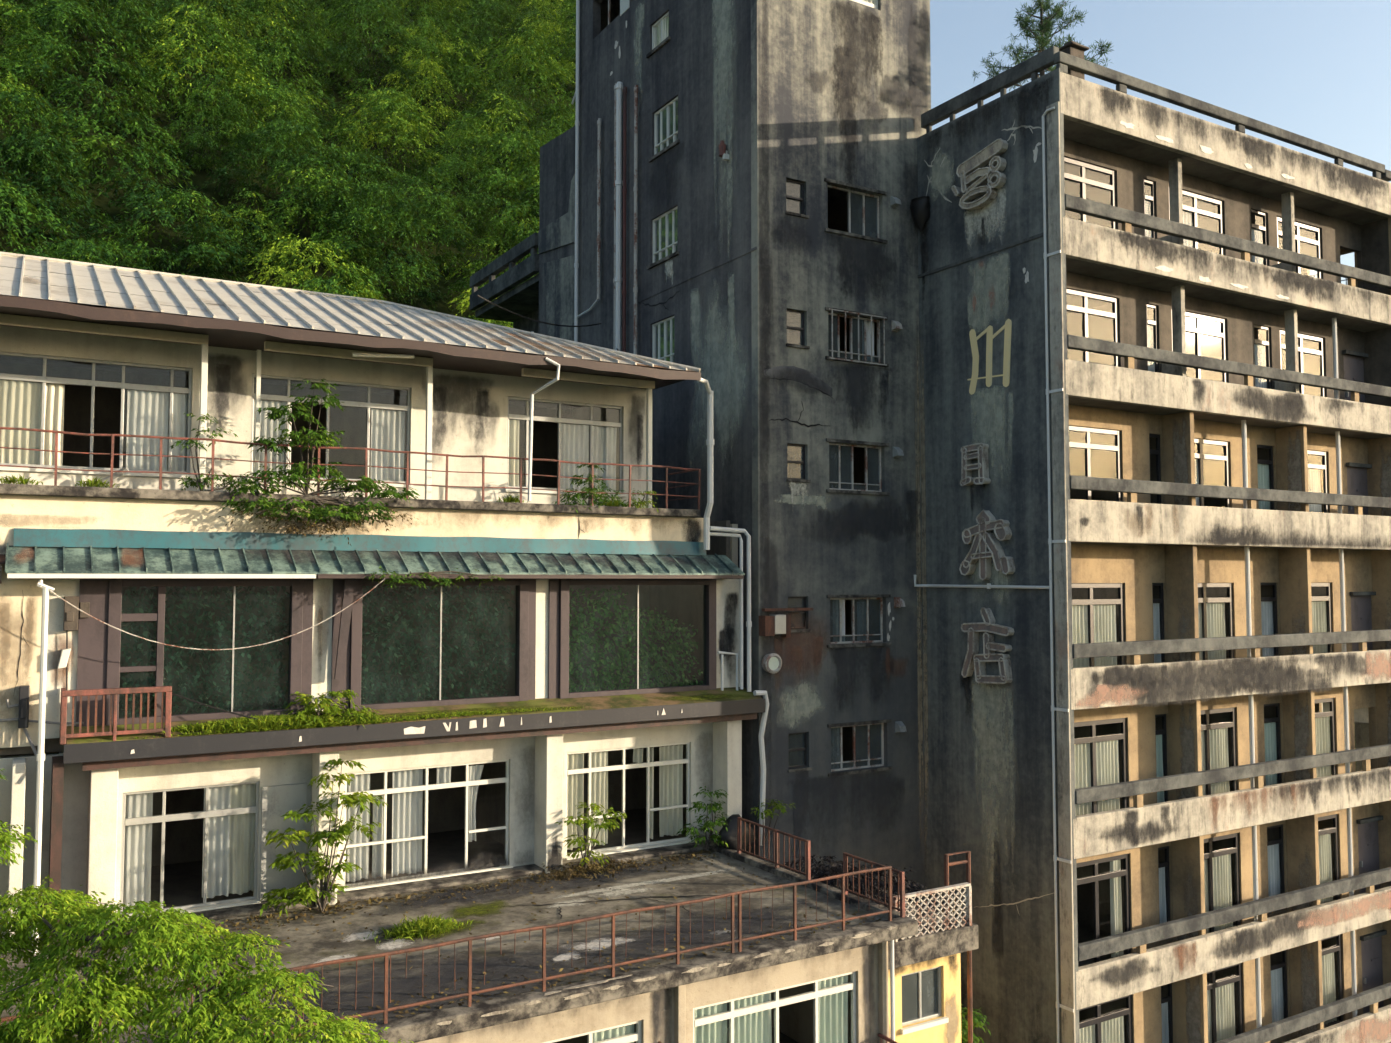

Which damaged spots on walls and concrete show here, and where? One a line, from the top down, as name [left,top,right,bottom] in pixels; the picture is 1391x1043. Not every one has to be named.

leakage [832,3,881,190]
leakage [1119,232,1177,261]
leakage [1273,271,1334,299]
leakage [208,355,241,425]
leakage [1193,379,1205,402]
leakage [432,375,496,449]
crack [769,403,823,427]
leakage [1096,665,1167,690]
leakage [1315,653,1367,677]
leakage [1311,782,1320,808]
leakage [1126,810,1138,838]
leakage [1093,959,1153,985]